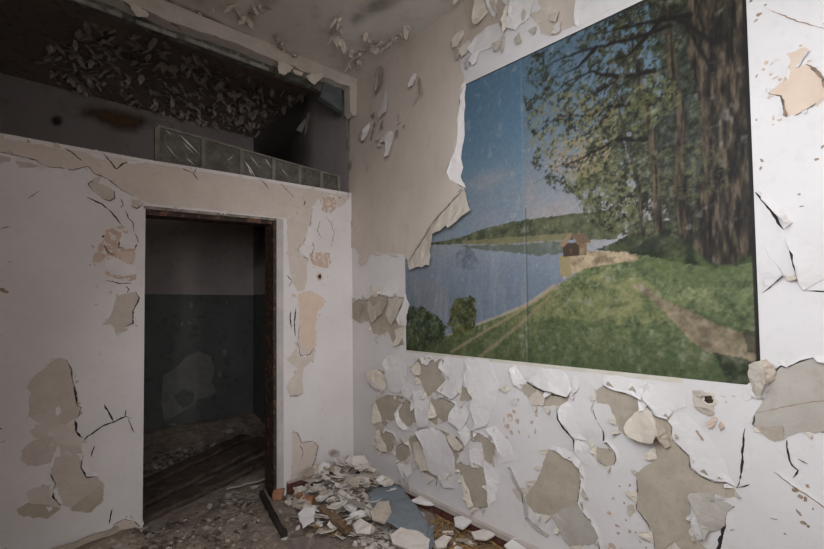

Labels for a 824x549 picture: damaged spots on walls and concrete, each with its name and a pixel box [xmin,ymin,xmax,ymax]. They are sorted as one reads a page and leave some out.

peeling [755,44,824,125]
peeling [0,0,630,399]
peeling [755,190,793,229]
peeling [759,237,824,293]
peeling [17,357,105,519]
crack [84,404,135,456]
peeling [352,279,824,549]
peeling [108,510,144,530]
crack [716,428,752,549]
crack [774,440,824,528]